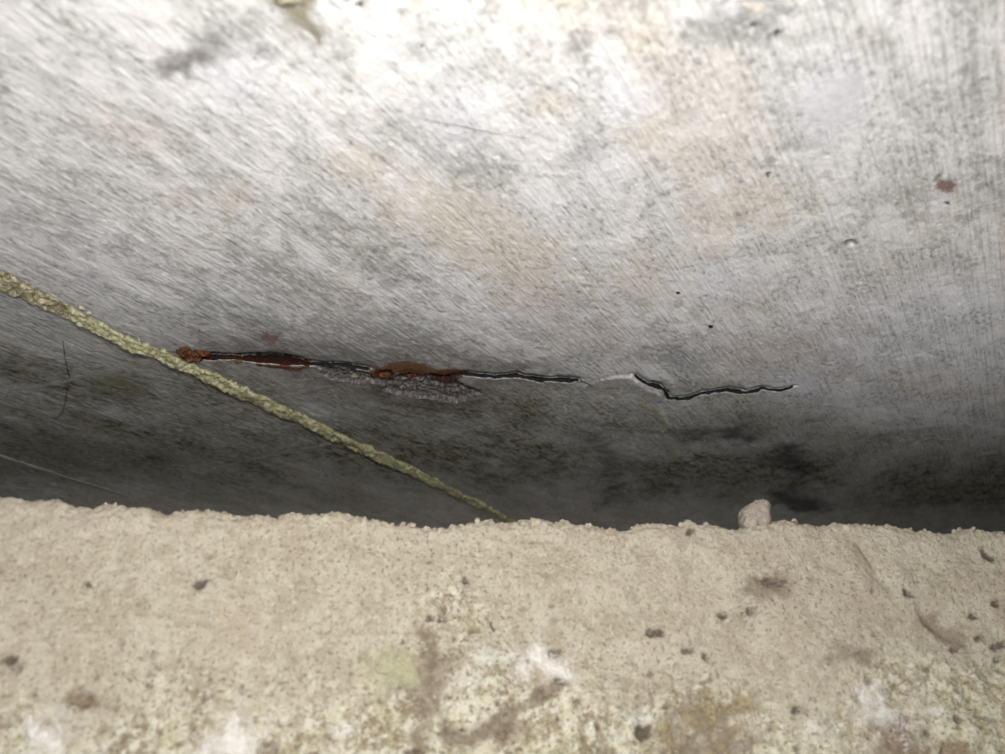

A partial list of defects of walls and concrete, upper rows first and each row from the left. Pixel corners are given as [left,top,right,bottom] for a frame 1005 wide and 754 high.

corrosion [173,346,212,363]
crack [202,354,369,371]
corrosion [369,361,468,382]
crack [452,372,793,401]